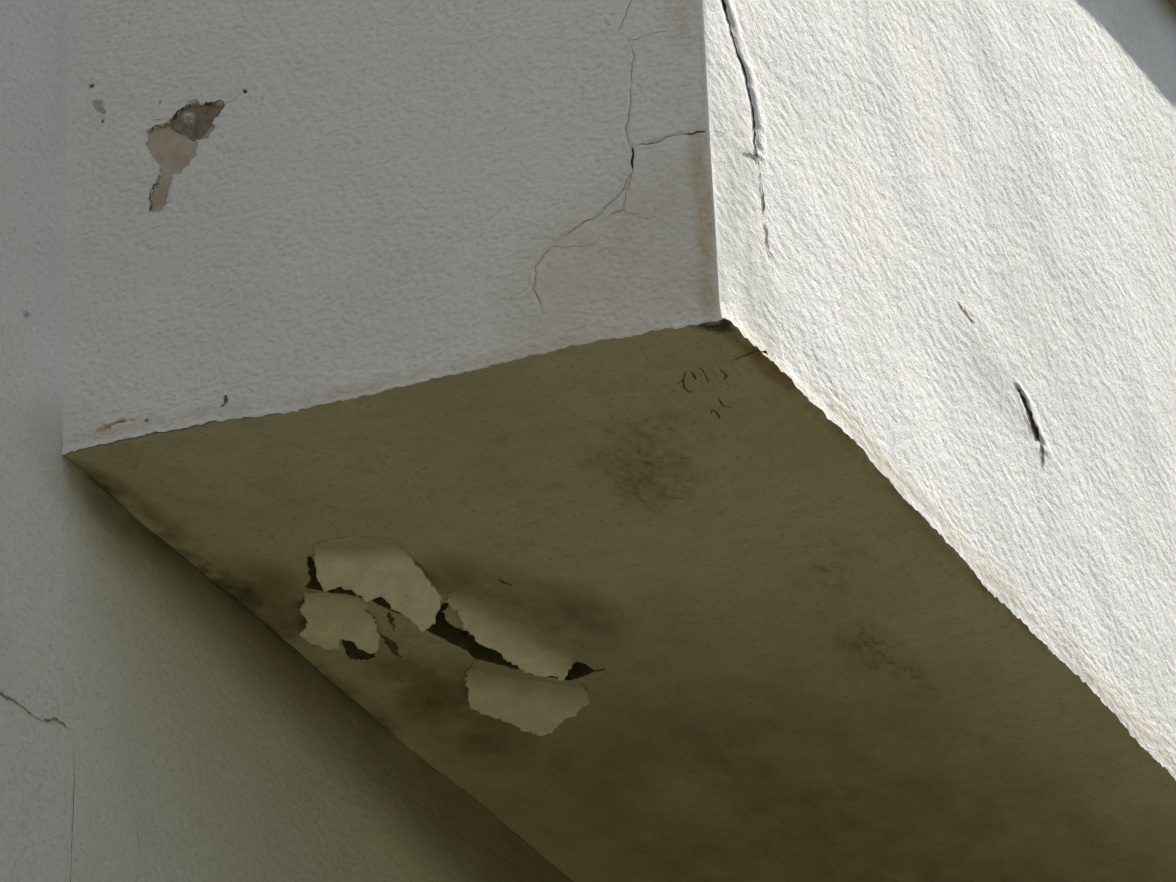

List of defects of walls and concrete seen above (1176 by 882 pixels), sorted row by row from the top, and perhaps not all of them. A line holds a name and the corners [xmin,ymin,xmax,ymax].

peeling [146,89,247,213]
crack [532,0,775,317]
crack [1017,387,1045,466]
peeling [299,536,605,736]
crack [0,691,75,882]